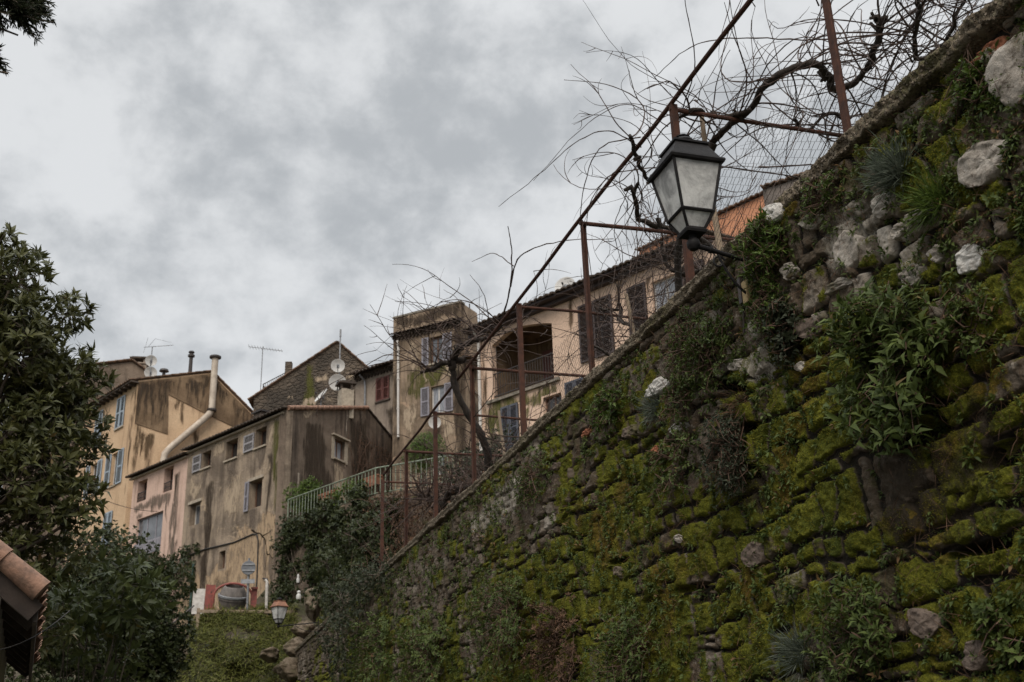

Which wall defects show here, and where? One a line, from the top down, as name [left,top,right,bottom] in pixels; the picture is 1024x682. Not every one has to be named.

damp [127,390,154,468]
damp [297,423,332,493]